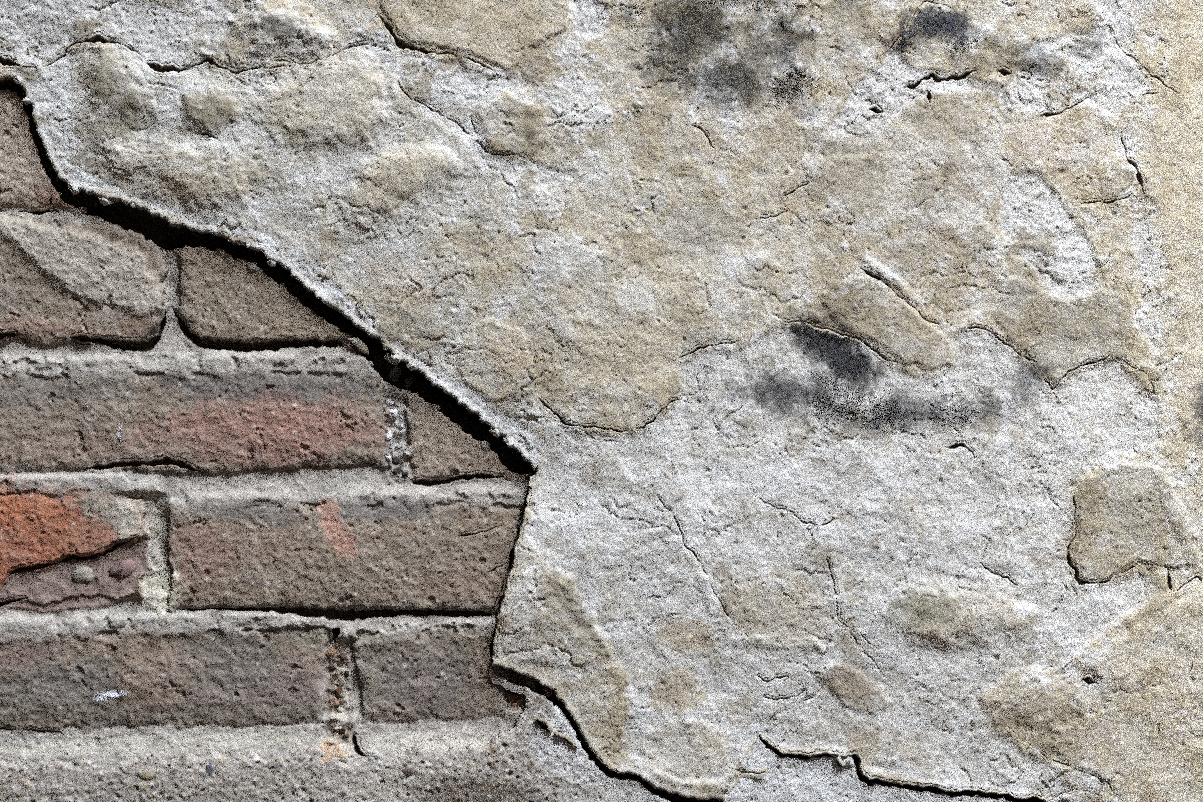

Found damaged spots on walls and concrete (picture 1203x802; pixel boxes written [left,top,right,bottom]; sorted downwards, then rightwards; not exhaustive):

peeling [0,0,241,78]
crack [901,68,978,105]
crack [1038,28,1199,207]
crack [776,318,902,365]
crack [843,262,1160,398]
water stain [752,376,841,410]
water stain [855,391,946,429]
crack [943,441,978,462]
spalling [0,534,150,615]
crack [749,492,888,679]
crack [1064,490,1203,594]
crack [729,725,1117,802]